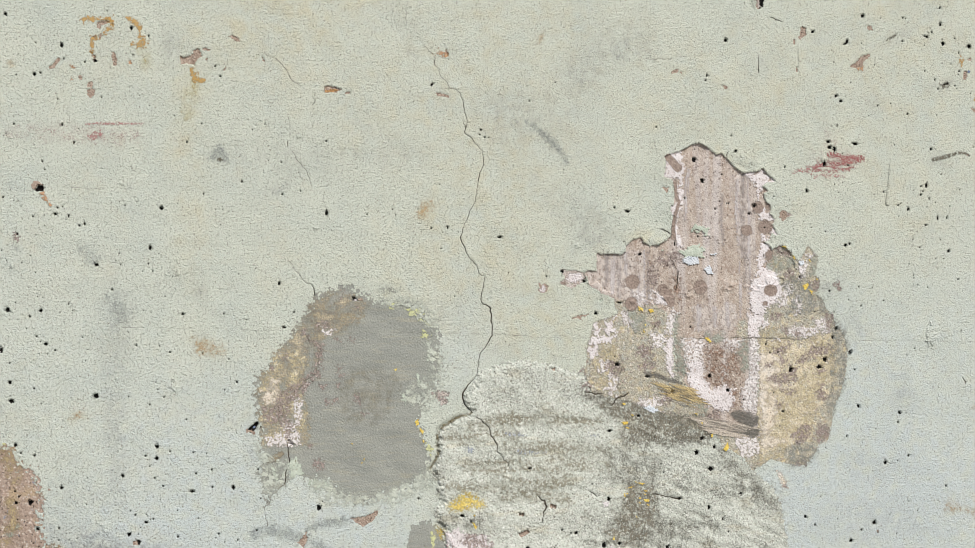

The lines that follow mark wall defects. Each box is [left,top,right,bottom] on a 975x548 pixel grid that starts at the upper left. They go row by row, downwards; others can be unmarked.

peeling [0,443,63,548]
water stain [262,328,325,440]
crack [427,48,493,413]
peeling [560,143,851,488]